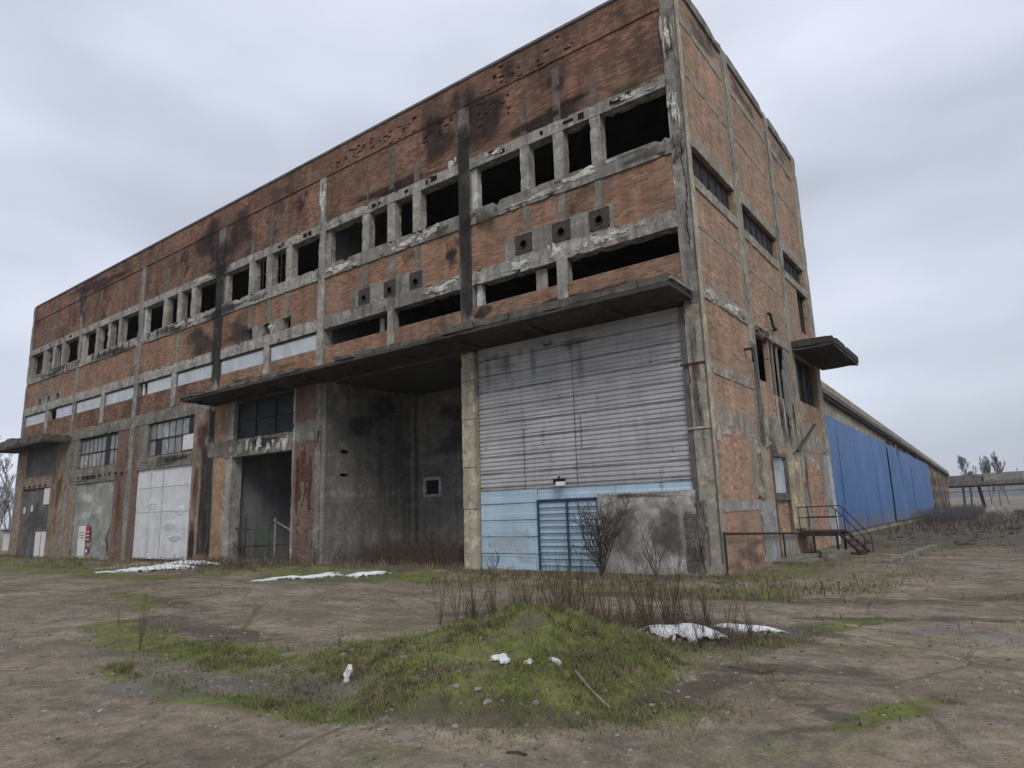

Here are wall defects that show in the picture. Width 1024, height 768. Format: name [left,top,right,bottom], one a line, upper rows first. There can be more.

spalling [659,9,673,61]
water stain [510,76,585,137]
spalling [511,158,616,206]
crack [677,129,692,255]
spalling [391,223,443,252]
spalling [582,221,646,248]
water stain [652,510,702,573]